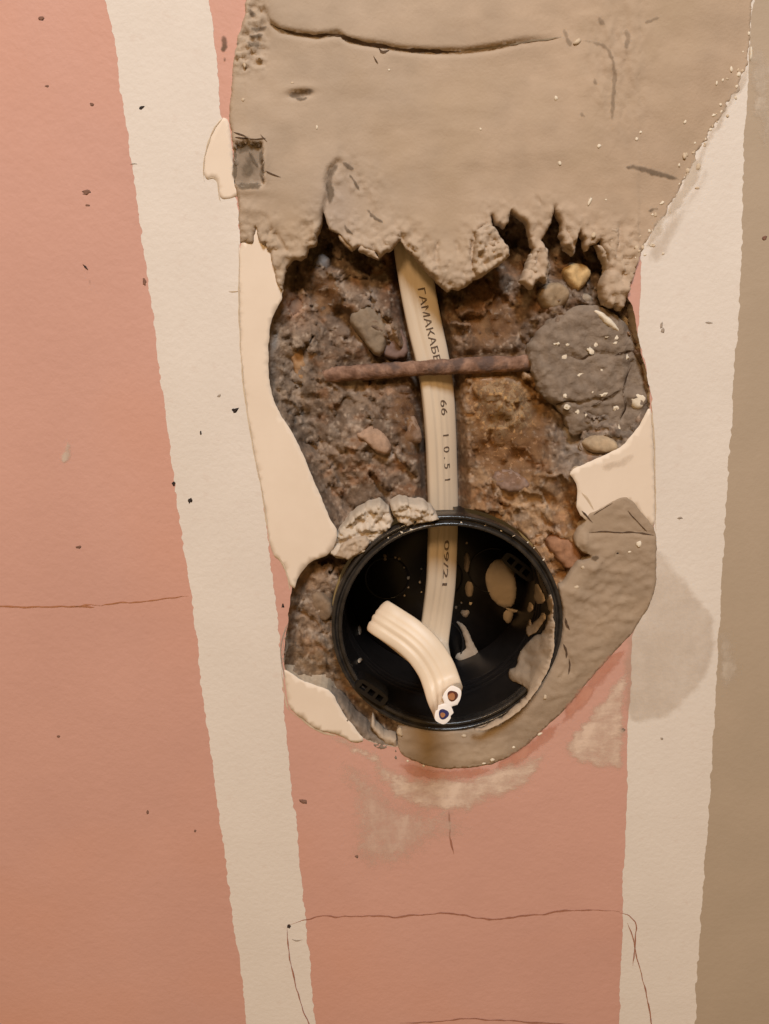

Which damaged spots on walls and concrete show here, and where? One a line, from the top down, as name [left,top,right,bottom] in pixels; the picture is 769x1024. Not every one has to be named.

crack [271,24,558,63]
peeling [594,310,619,331]
spalling [322,354,531,383]
peeling [228,228,337,589]
peeling [570,394,656,526]
crack [0,596,182,608]
peeling [281,669,397,747]
crack [287,910,652,1024]